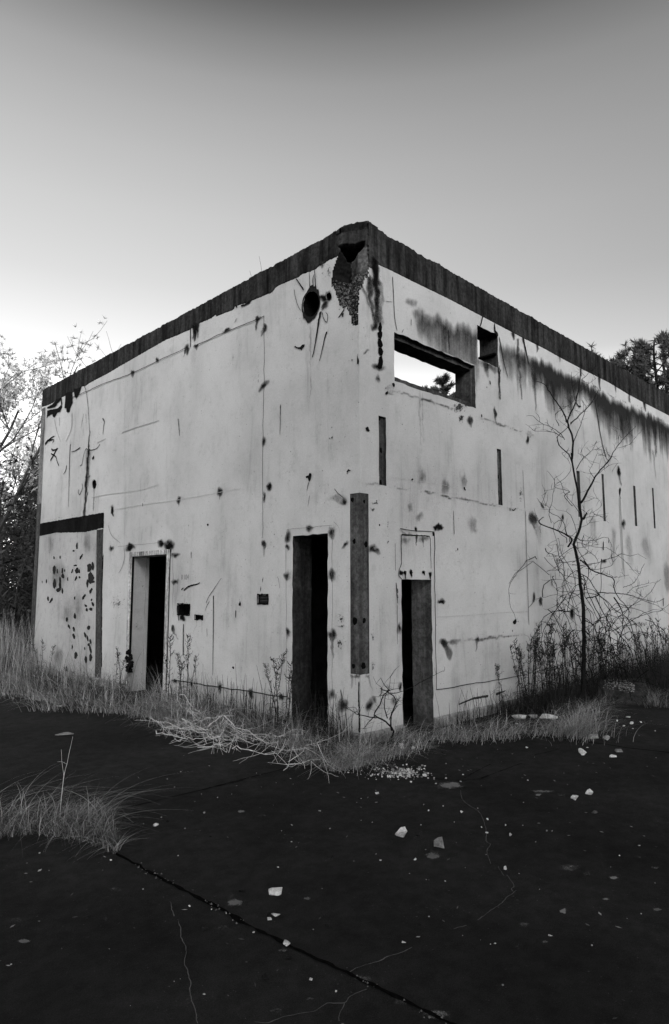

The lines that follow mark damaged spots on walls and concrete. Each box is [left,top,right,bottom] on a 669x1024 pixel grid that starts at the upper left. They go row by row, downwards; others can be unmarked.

spalling [331,229,369,326]
leakage [362,255,384,324]
leakage [415,313,669,453]
crack [171,906,198,1023]